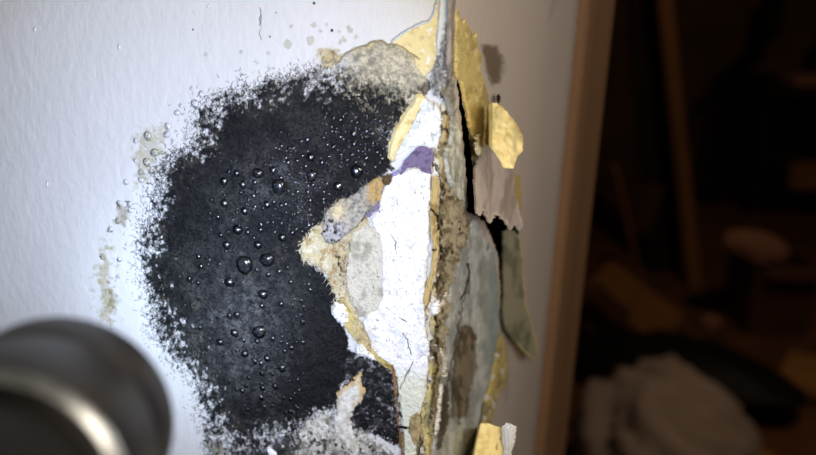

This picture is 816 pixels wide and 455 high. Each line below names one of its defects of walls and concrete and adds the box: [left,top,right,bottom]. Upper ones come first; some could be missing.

peeling [390,3,439,76]
peeling [454,9,523,209]
leakage [117,23,458,455]
flaking render [346,86,451,455]
flaking render [333,372,366,455]
peeling [470,332,517,455]